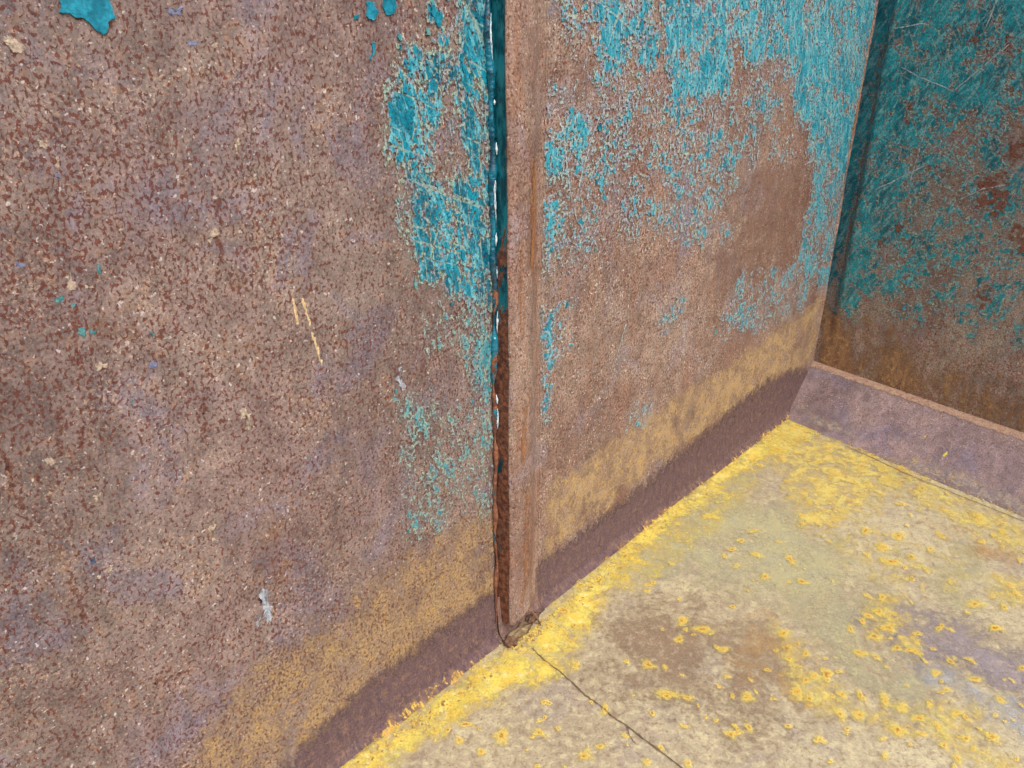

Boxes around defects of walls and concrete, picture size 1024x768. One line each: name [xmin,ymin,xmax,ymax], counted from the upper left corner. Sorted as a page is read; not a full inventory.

peeling [378,0,494,542]
peeling [540,297,579,429]
peeling [541,0,1024,354]
rust [545,298,1024,553]
rust [972,137,1024,219]
rust [1008,223,1024,261]
rust [198,510,494,768]
crack [531,647,683,768]
rust [340,417,1024,768]